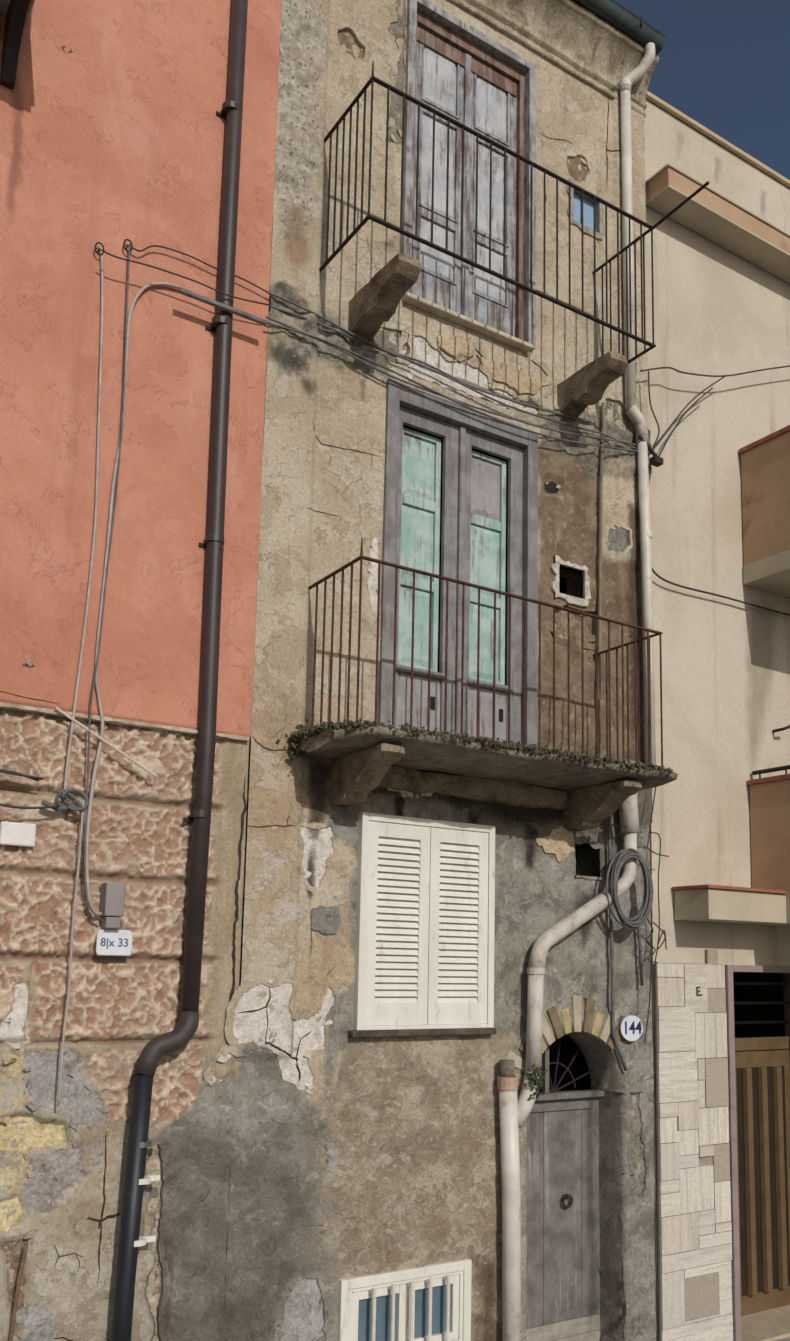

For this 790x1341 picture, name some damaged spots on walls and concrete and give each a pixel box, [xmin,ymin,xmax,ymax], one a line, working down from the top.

flaking render [367,321,544,423]
flaking render [535,819,606,862]
crack [229,777,311,1086]
flaking render [204,974,342,1098]
spalling [0,983,109,1339]
crack [54,1135,121,1283]
spalling [272,1269,333,1341]